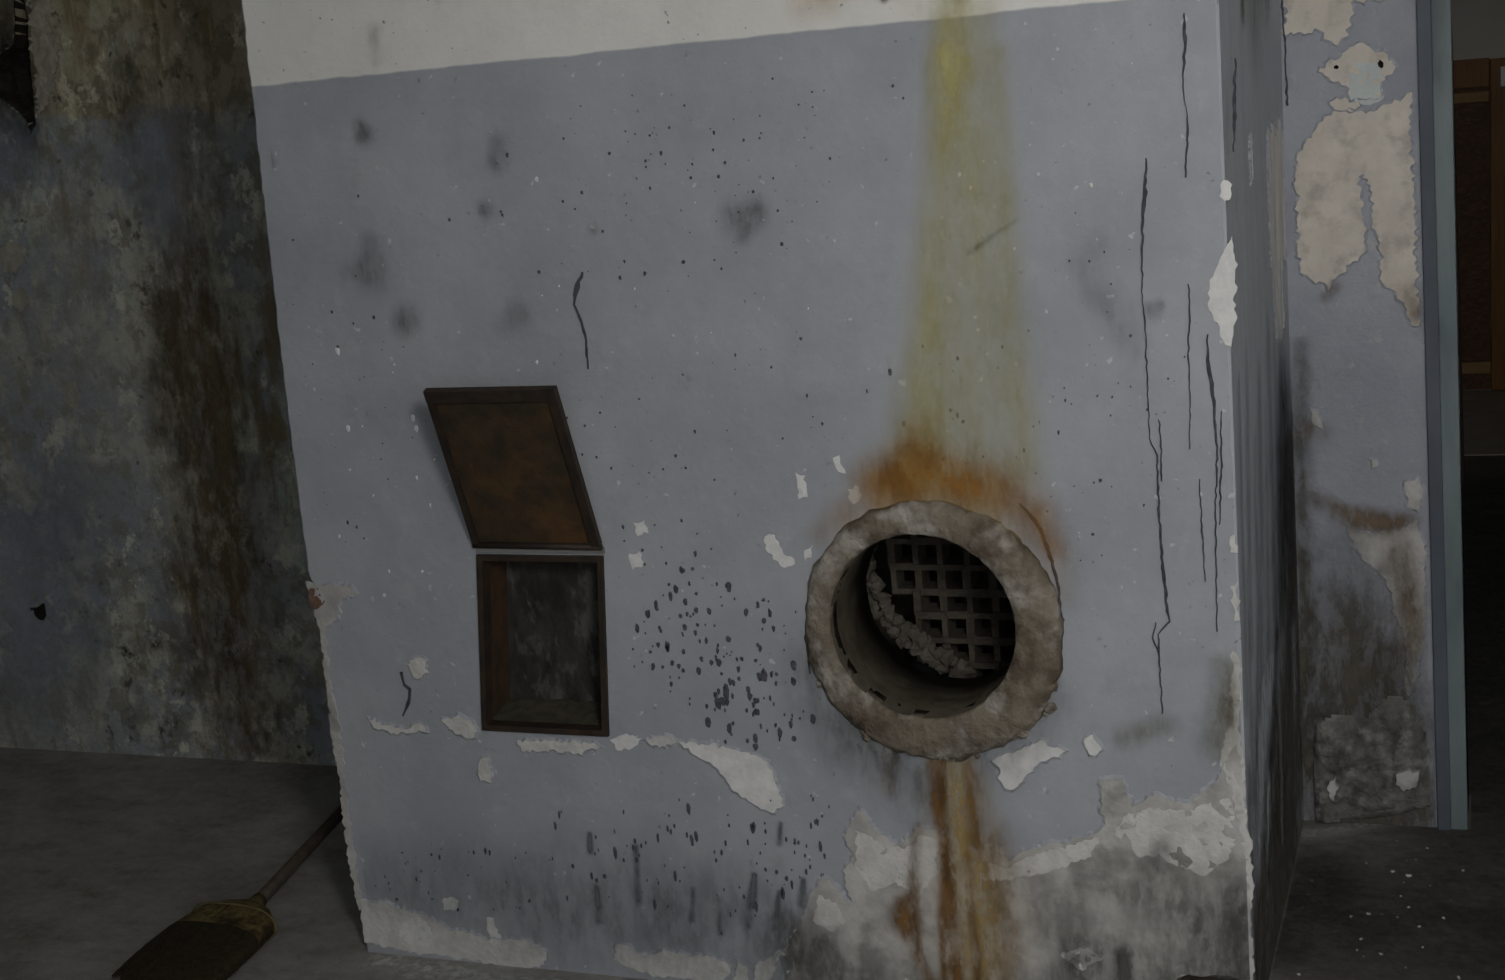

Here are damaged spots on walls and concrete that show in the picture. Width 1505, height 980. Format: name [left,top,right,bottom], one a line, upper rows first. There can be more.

crack [1181,13,1189,177]
crack [1230,57,1238,152]
peeling [1220,0,1423,346]
crack [573,272,589,369]
peeling [1208,238,1238,352]
leakage [155,125,281,758]
crack [1141,158,1223,714]
peeling [516,732,785,816]
peeling [612,651,1255,980]
rust [894,760,998,980]
leakage [1117,950,1131,980]
leakage [1179,432,1505,980]